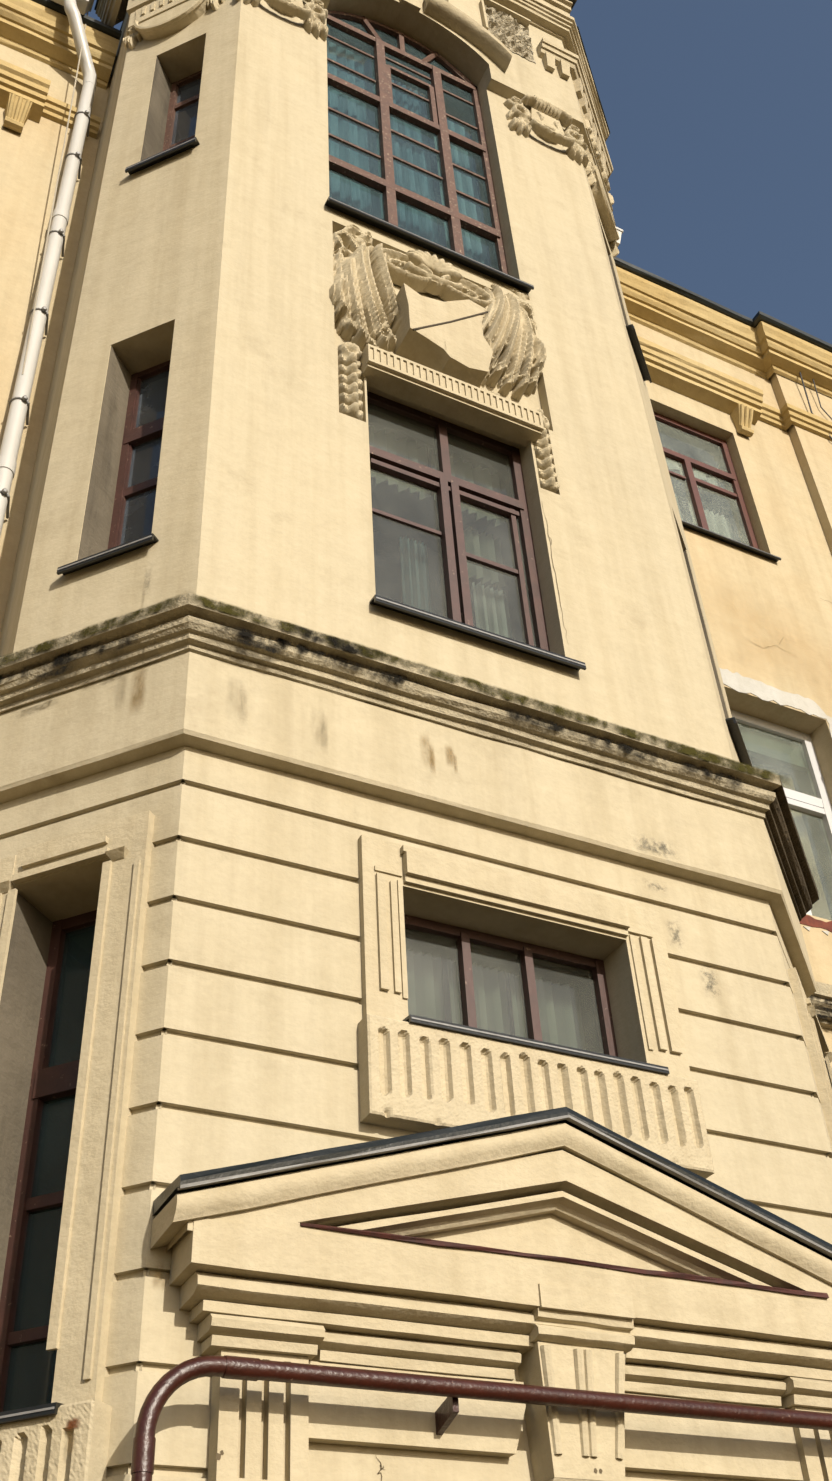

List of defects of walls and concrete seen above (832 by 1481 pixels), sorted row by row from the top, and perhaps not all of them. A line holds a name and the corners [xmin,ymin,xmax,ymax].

water stain [0,636,134,684]
water stain [223,626,407,684]